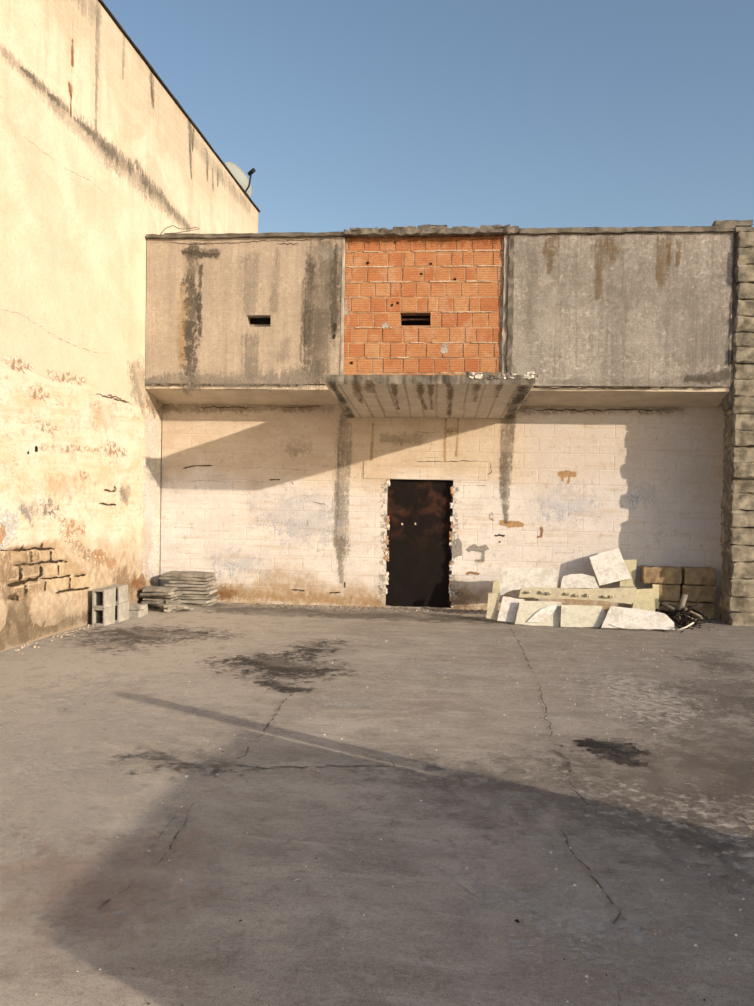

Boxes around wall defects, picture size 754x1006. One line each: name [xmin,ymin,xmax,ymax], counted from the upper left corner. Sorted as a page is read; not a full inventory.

damp [82,54,152,194]
peeling [4,357,33,373]
peeling [28,420,127,457]
damp [129,243,375,443]
damp [416,382,434,410]
damp [500,452,512,492]
peeling [0,507,20,550]
peeling [40,499,116,570]
damp [114,456,161,598]
damp [334,482,349,583]
spalling [377,479,403,605]
crack [559,828,622,946]